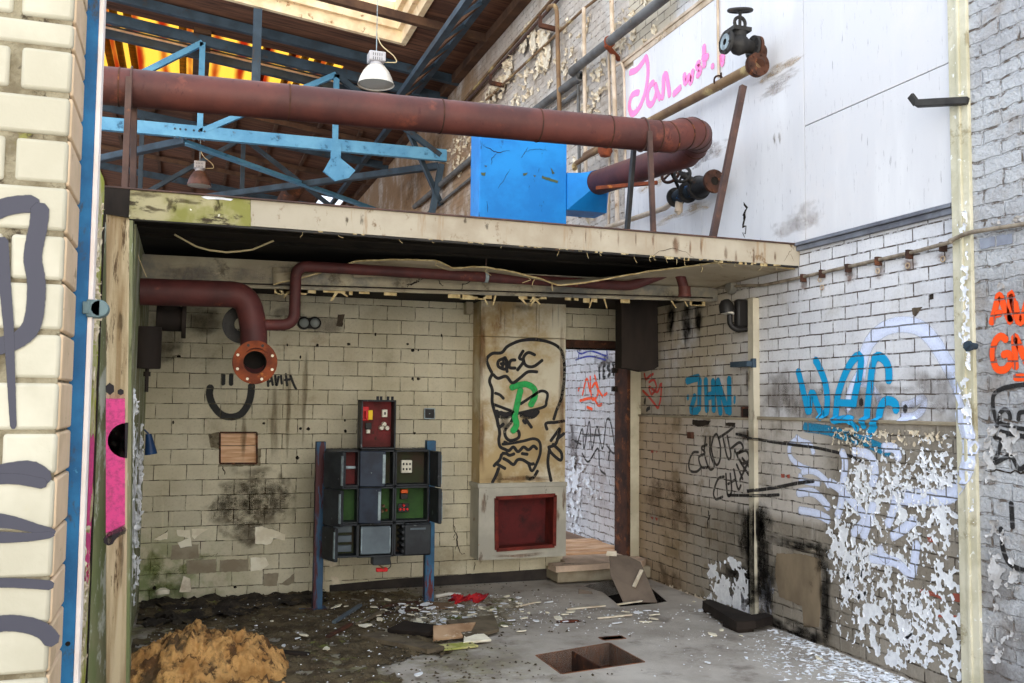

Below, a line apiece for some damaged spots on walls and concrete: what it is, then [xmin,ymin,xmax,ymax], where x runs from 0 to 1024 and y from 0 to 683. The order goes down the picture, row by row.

peeling [479,0,667,114]
peeling [446,135,471,178]
peeling [744,201,1024,683]
peeling [132,388,144,606]
water stain [217,489,286,545]
peeling [565,451,607,534]
water stain [739,507,771,553]
peeling [665,556,750,614]
water stain [720,544,831,644]